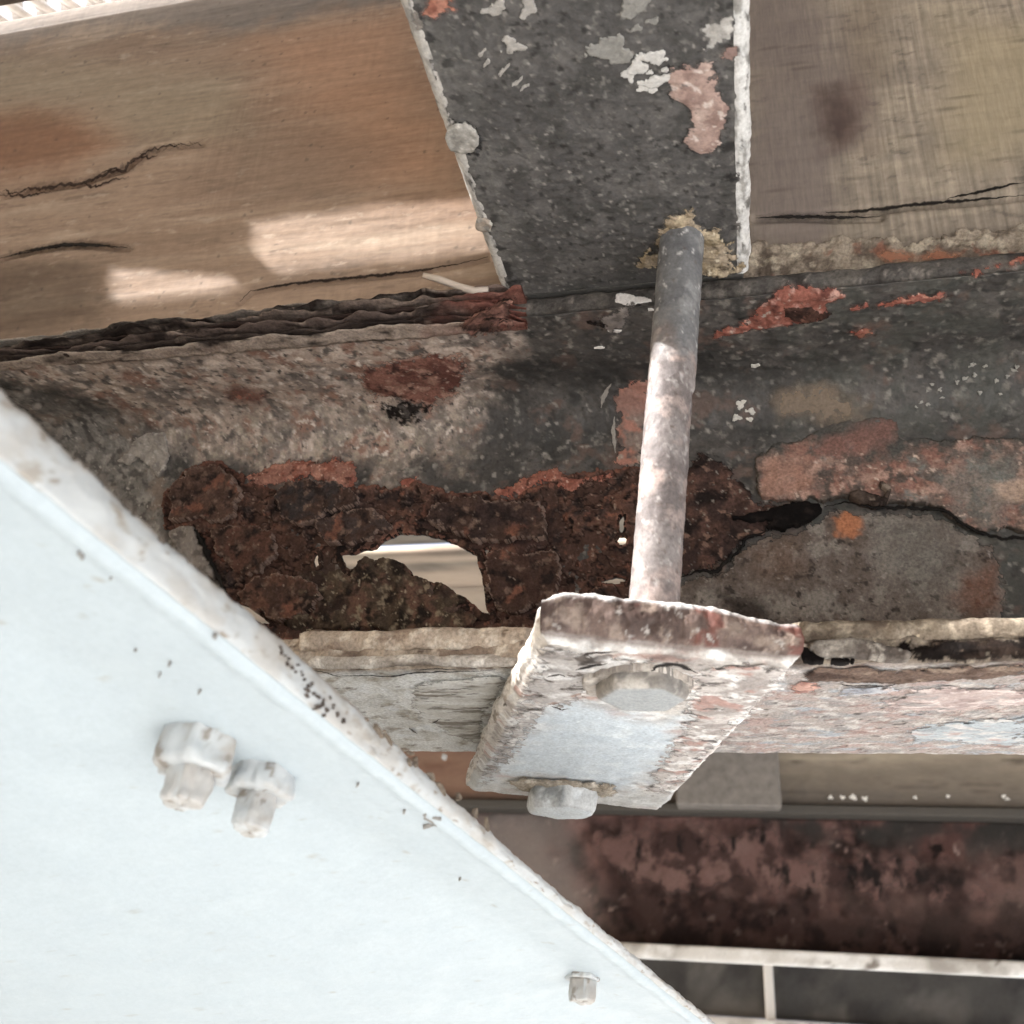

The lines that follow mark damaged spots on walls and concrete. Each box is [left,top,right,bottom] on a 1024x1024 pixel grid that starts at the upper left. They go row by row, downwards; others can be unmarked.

peeling [584,0,738,154]
crack [0,142,199,198]
crack [760,183,1024,219]
crack [0,242,128,259]
corrosion [161,460,640,670]
crack [824,501,1024,541]
peeling [478,647,653,785]
peeling [644,662,821,796]
corrosion [587,819,1001,911]